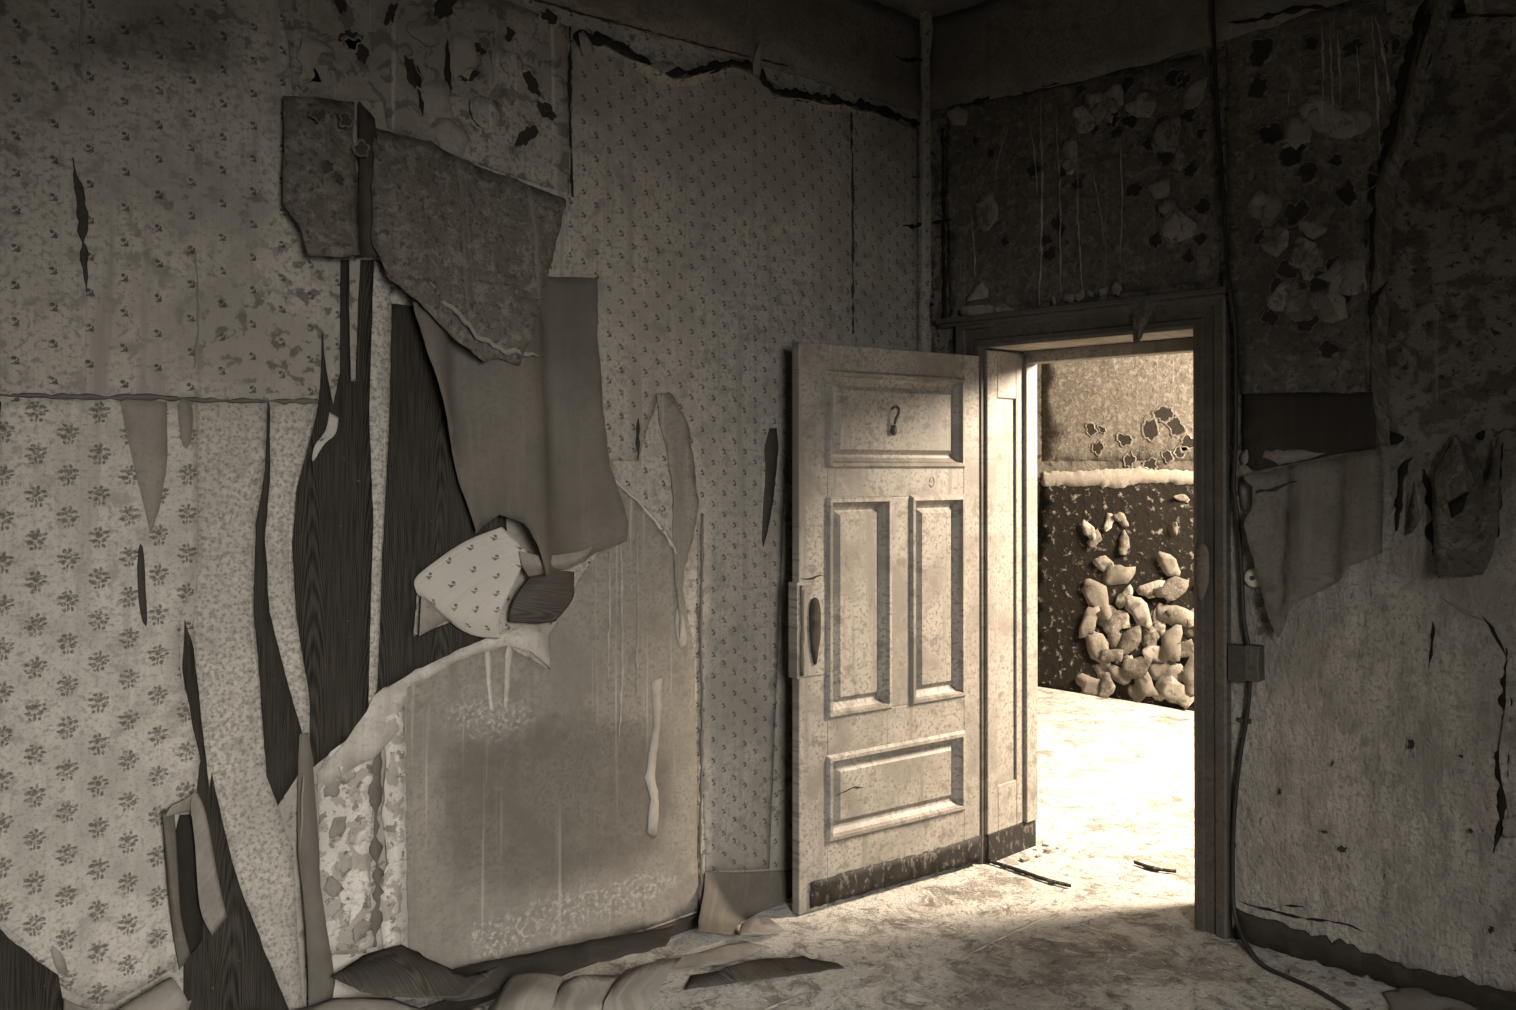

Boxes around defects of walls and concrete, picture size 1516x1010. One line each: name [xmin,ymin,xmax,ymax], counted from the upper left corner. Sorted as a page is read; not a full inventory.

peeling [278,0,920,197]
peeling [945,0,1404,710]
flaking render [317,476,704,1001]
crack [1429,597,1516,853]